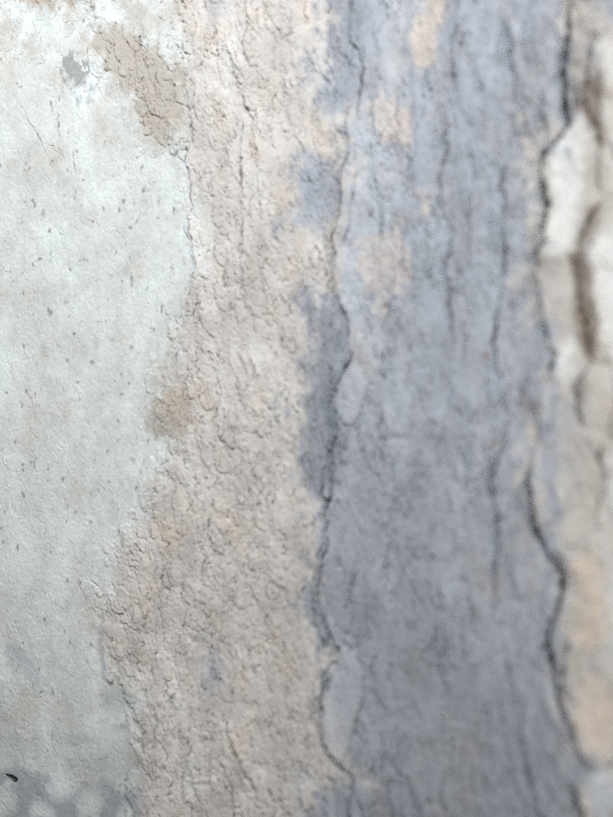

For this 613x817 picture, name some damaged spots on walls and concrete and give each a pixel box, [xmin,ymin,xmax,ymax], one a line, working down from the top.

crack [313,0,366,817]
crack [489,65,613,711]
peeling [581,369,613,457]
peeling [544,577,576,693]
peeling [542,683,574,752]
peeling [579,777,606,817]